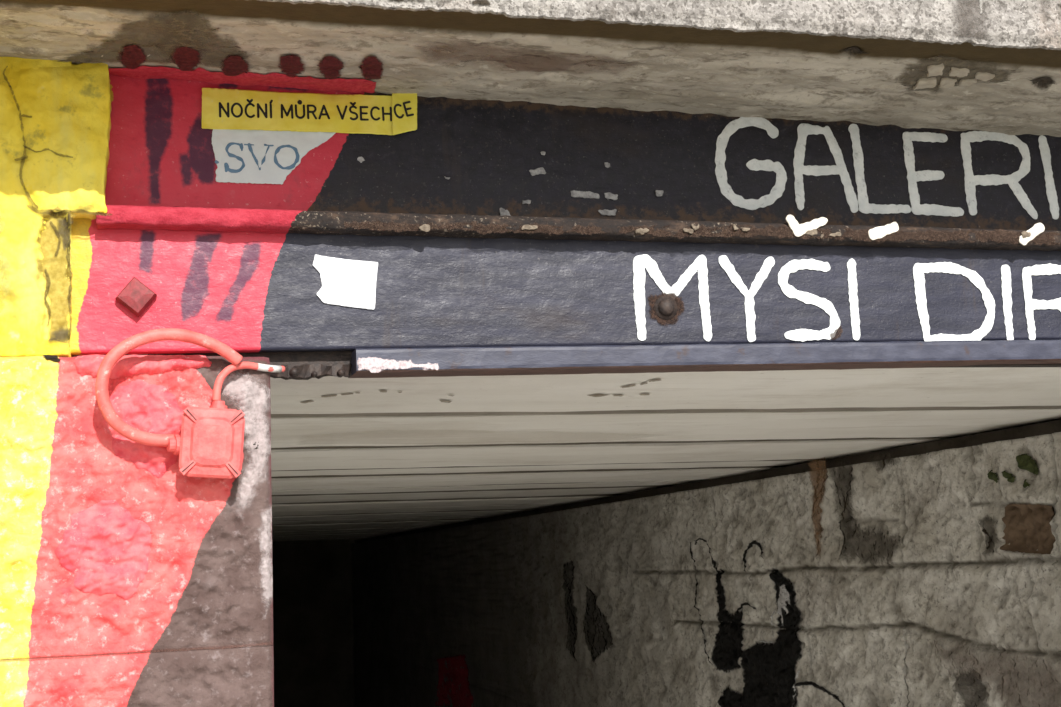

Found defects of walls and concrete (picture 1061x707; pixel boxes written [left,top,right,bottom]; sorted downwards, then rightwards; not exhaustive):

flaking render [900,56,1015,92]
crack [3,66,112,216]
corrosion [344,221,604,235]
corrosion [618,224,1061,245]
corrosion [648,293,684,325]
corrosion [808,458,828,555]